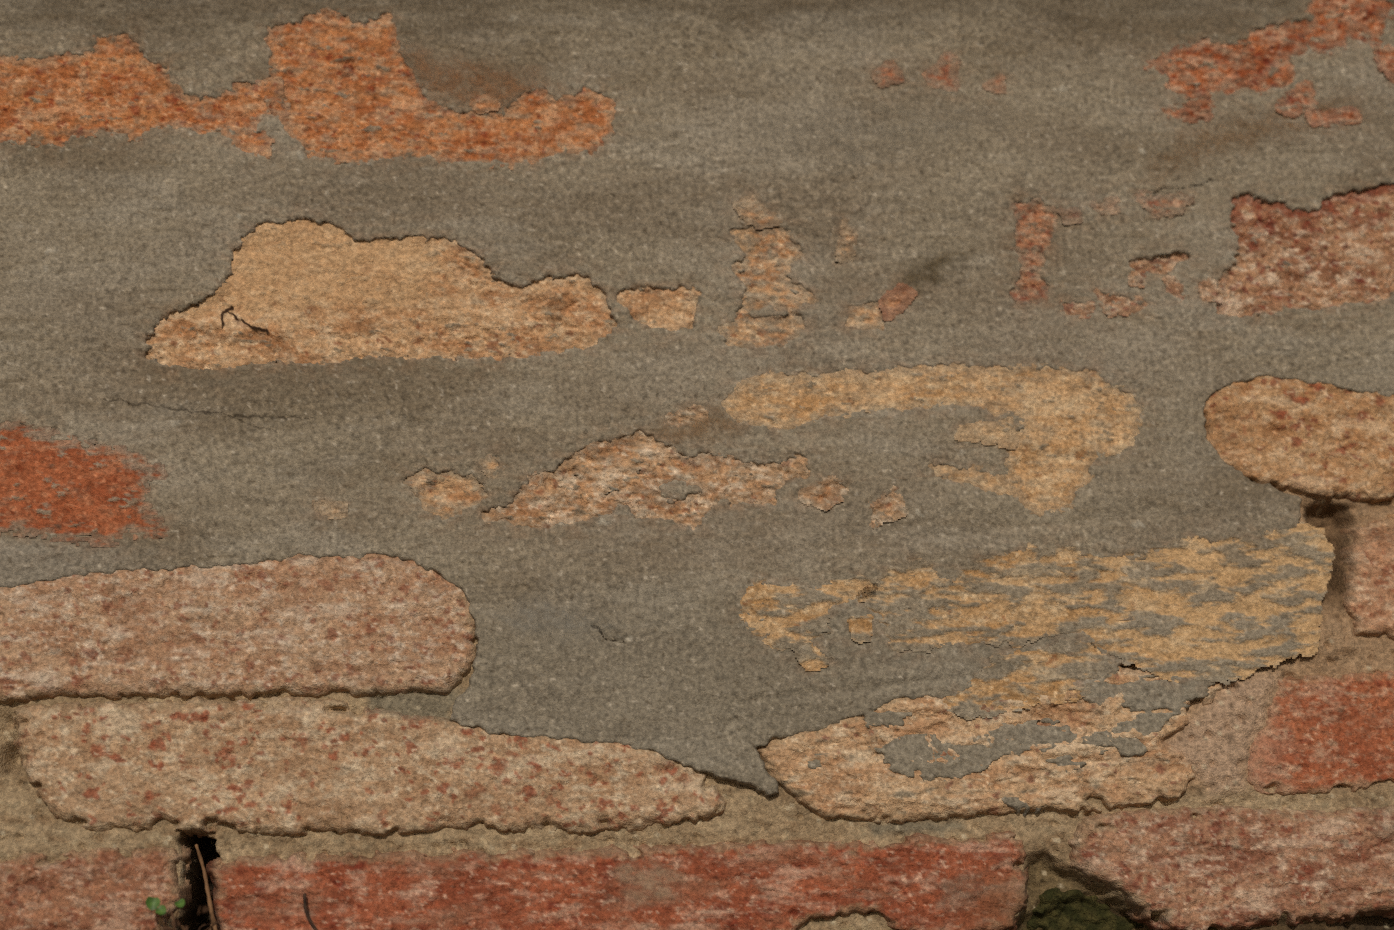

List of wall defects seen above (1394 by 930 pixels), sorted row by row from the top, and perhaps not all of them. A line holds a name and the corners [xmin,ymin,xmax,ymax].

peeling [0,8,616,170]
peeling [1143,0,1394,128]
peeling [146,219,701,370]
peeling [718,194,819,349]
peeling [845,283,918,331]
peeling [1009,184,1394,319]
peeling [0,419,170,547]
peeling [403,362,1144,530]
peeling [739,575,876,671]
peeling [943,639,1119,720]